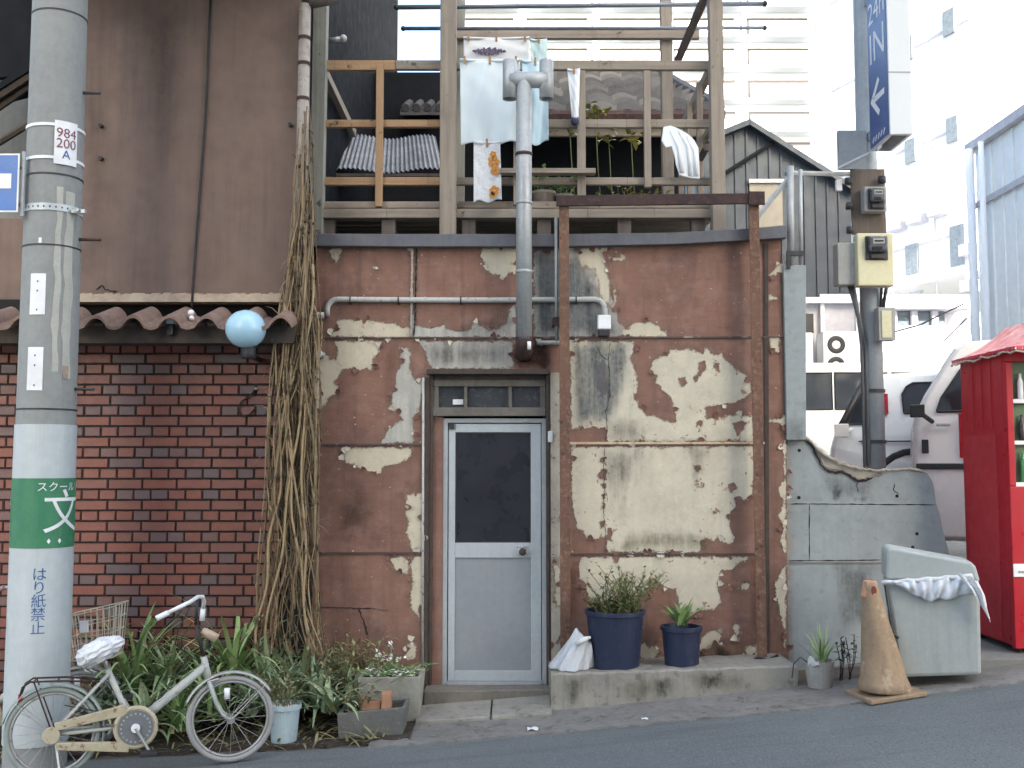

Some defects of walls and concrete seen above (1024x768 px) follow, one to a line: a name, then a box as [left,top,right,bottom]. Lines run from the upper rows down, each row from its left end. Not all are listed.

peeling [480,248,516,280]
leakage [540,261,597,331]
peeling [315,304,516,476]
peeling [532,247,794,655]
peeling [806,436,923,479]
crack [319,607,386,635]